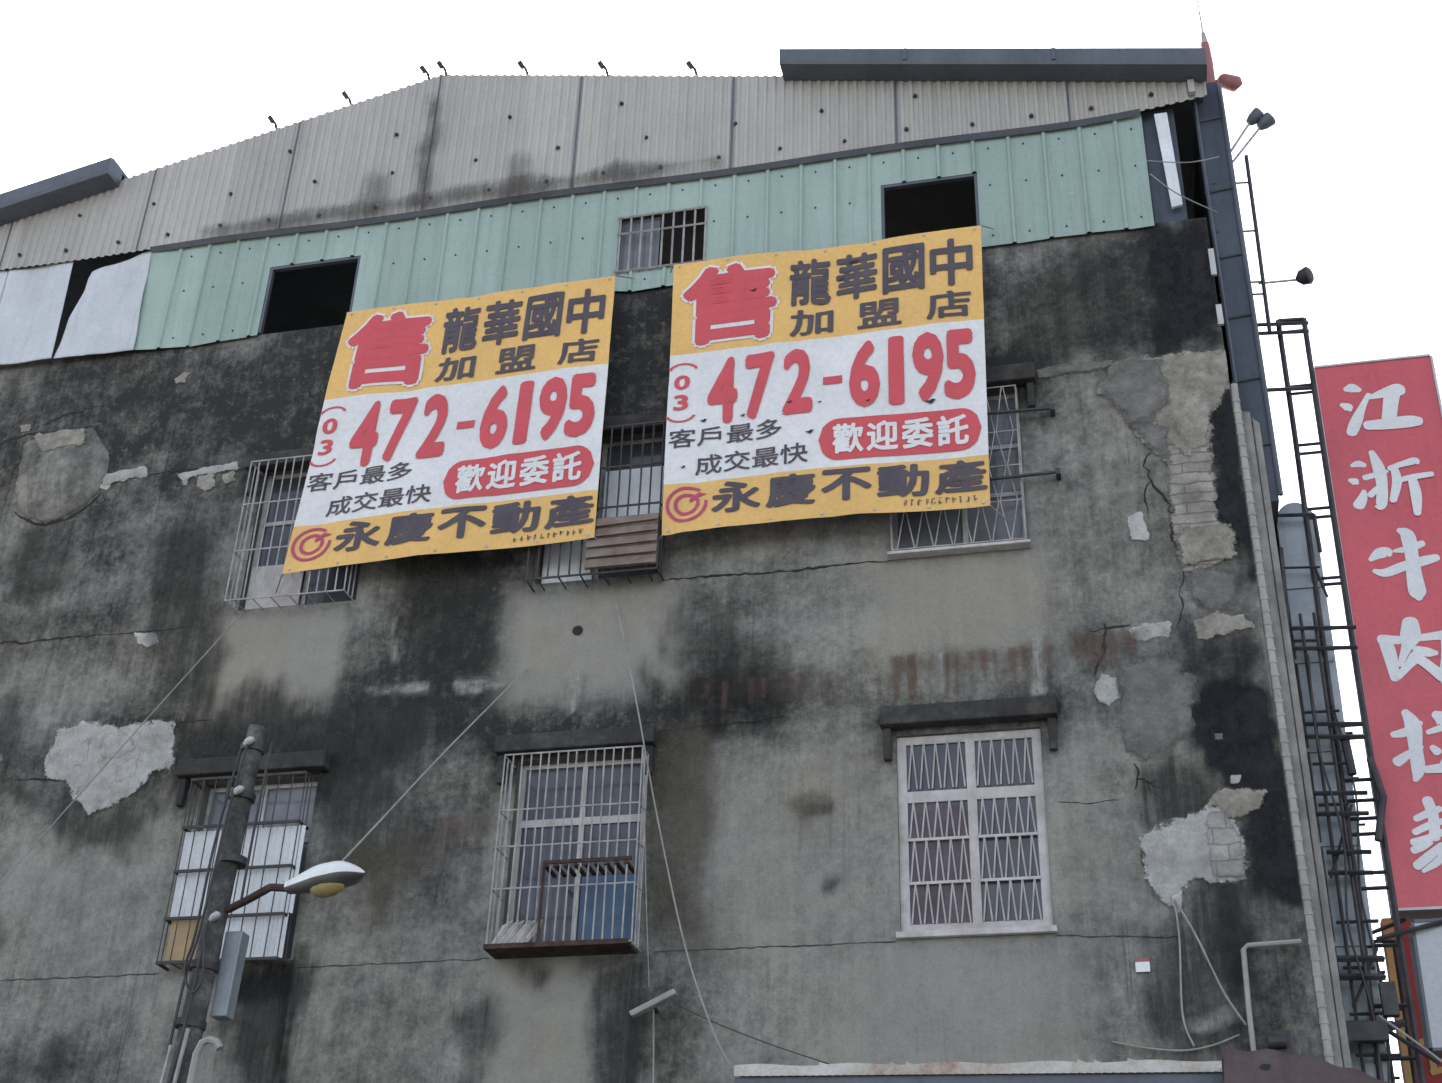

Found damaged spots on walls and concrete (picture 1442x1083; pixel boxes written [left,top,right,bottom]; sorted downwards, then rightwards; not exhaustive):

spalling [99,466,148,490]
spalling [177,461,238,491]
crack [1143,452,1185,629]
flaking render [1097,349,1255,641]
spalling [44,719,176,815]
water stain [54,526,503,915]
corrosion [893,654,916,699]
spalling [1094,674,1120,706]
spalling [1138,775,1268,913]